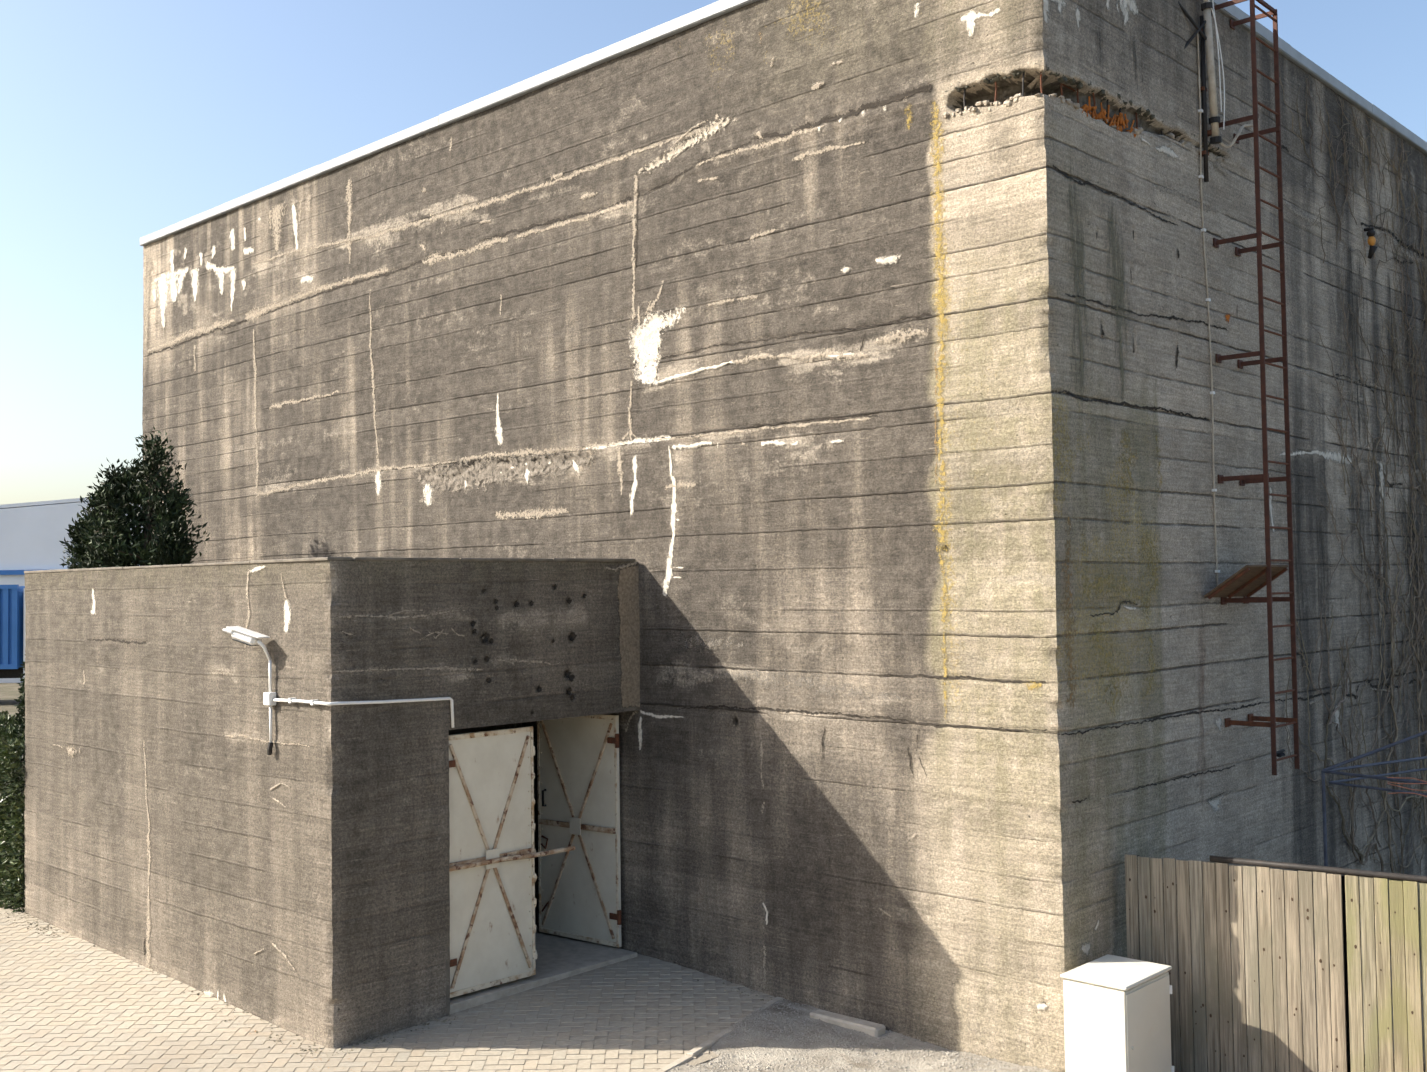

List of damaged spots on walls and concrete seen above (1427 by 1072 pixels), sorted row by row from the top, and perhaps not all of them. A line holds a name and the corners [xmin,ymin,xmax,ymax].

spalling [942,63,1227,175]
efflorescence [144,194,311,345]
damp [495,394,503,445]
efflorescence [663,446,696,596]
damp [930,102,950,713]
damp [1353,277,1403,629]
spalling [471,621,493,683]